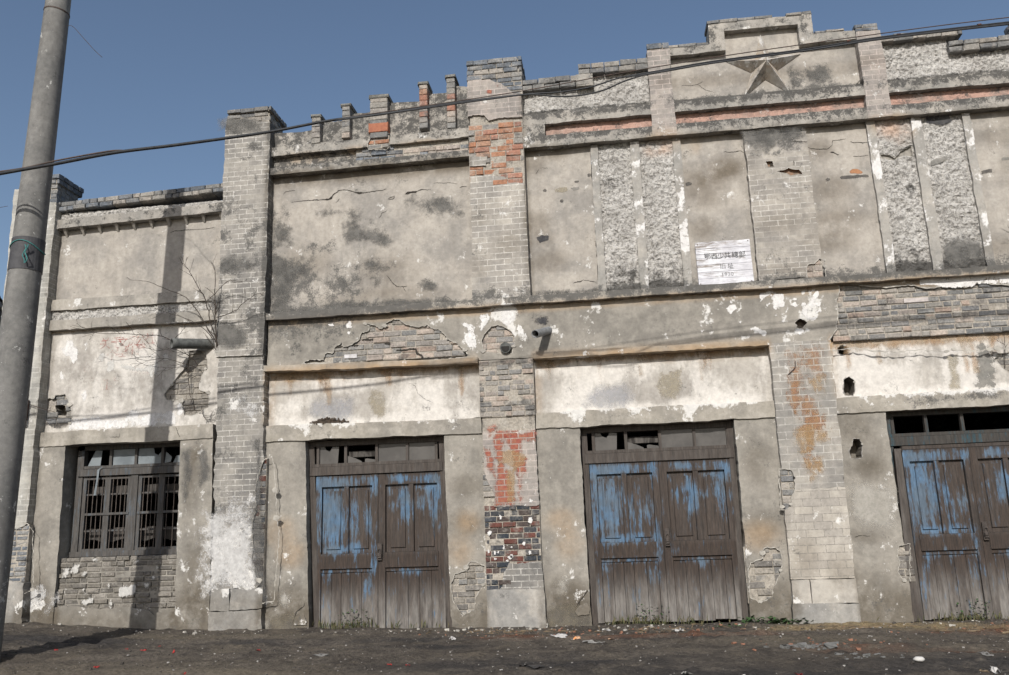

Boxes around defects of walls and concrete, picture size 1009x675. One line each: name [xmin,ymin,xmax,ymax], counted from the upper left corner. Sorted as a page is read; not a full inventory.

water stain [271,221,303,313]
water stain [345,212,391,246]
crack [286,182,467,218]
water stain [382,281,447,306]
flaking render [828,274,1009,373]
flaking render [45,350,210,431]
flaking render [302,310,536,419]
flaking render [778,469,796,510]
flaking render [9,523,58,607]
flaking render [450,452,542,616]
flaking render [742,547,783,603]
flaking render [897,542,916,582]